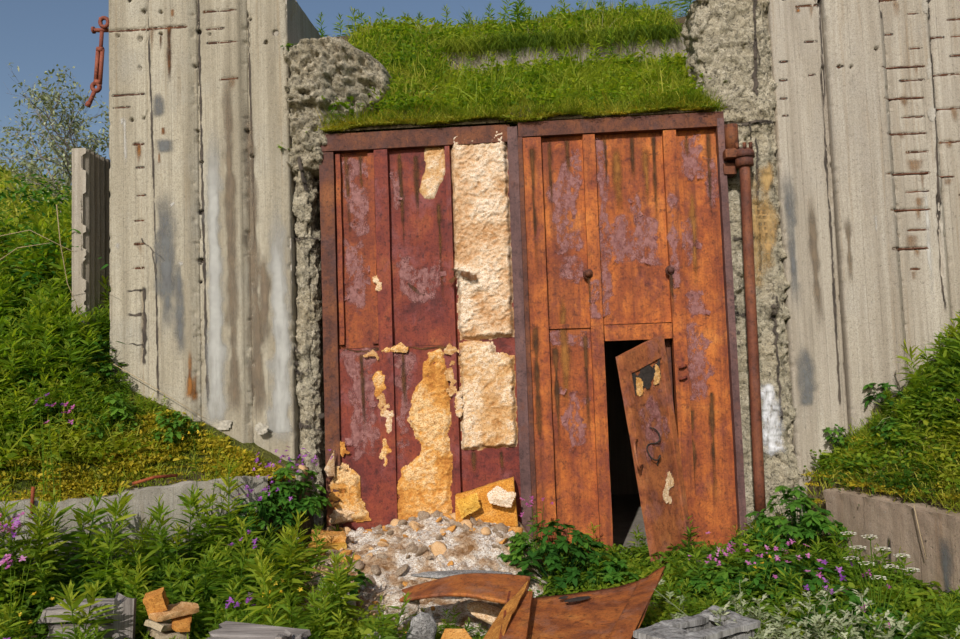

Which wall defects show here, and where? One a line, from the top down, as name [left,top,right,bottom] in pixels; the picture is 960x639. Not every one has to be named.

peeling [341,158,371,309]
corrosion [398,154,419,221]
peeling [547,138,715,400]
peeling [681,133,719,206]
corrosion [187,358,197,399]
peeling [341,348,380,461]
peeling [393,351,416,459]
corrosion [533,328,541,433]
corrosion [553,306,569,425]